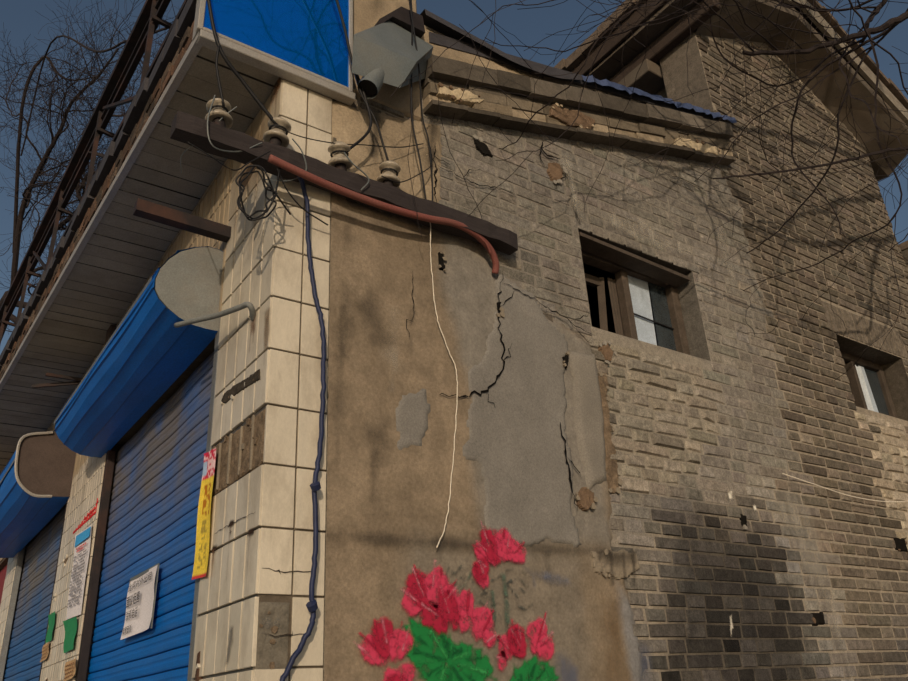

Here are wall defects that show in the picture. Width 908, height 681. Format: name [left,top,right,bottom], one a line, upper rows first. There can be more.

spalling [435,82,485,106]
spalling [549,103,595,129]
hole [472,135,493,158]
crack [440,278,595,406]
spalling [220,369,260,405]
peeling [598,341,623,494]
peeling [212,408,266,497]
spalling [576,487,598,511]
peeling [253,602,289,670]